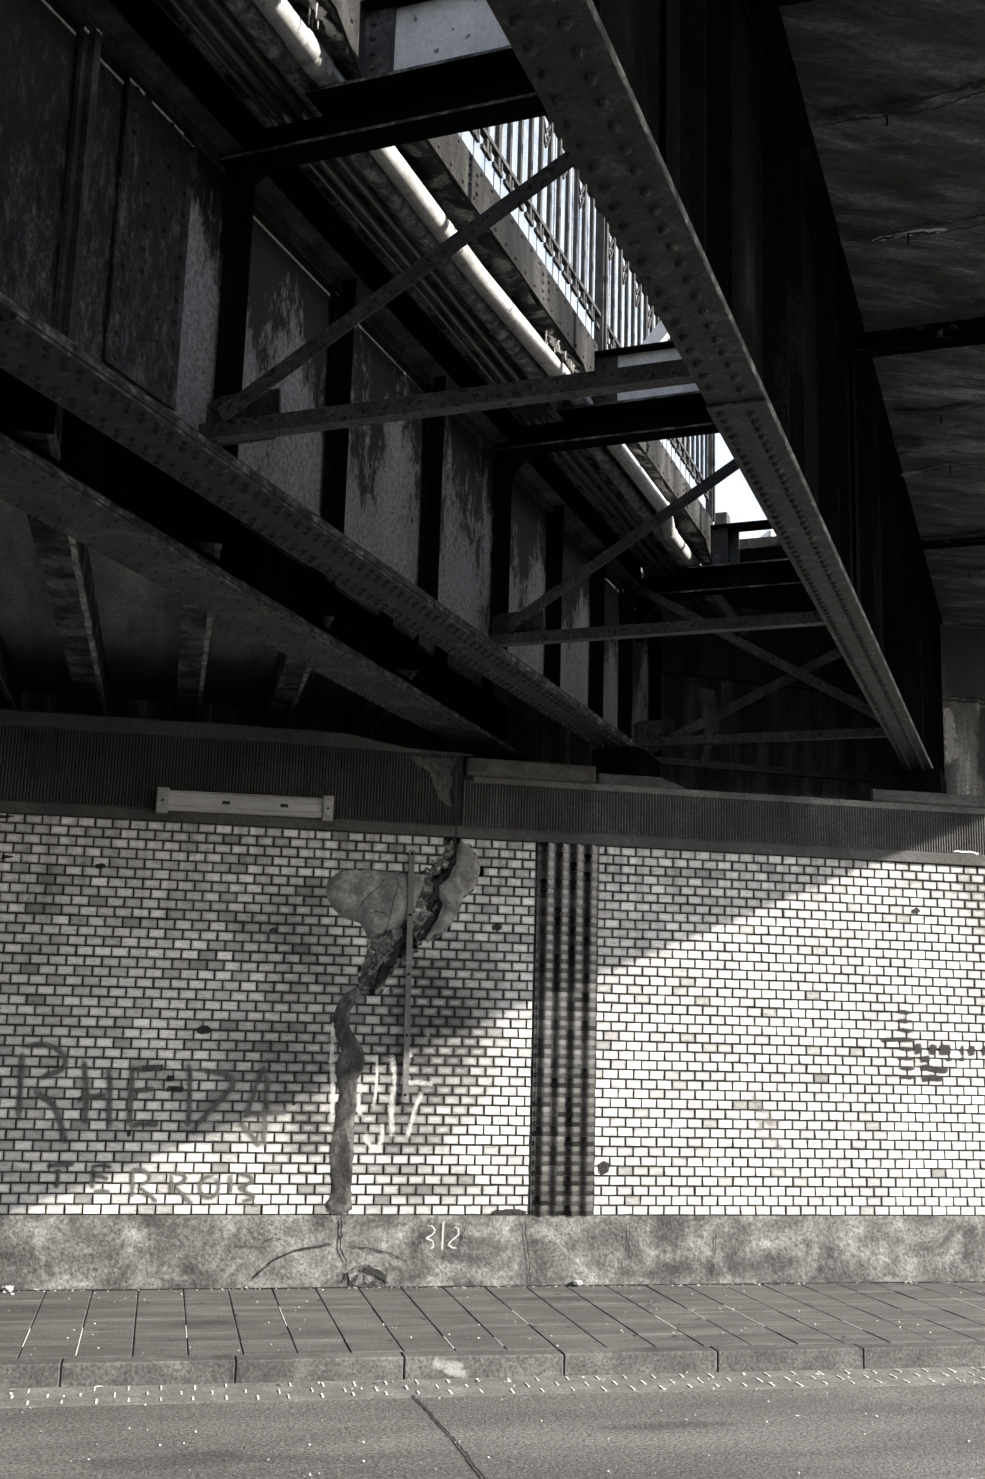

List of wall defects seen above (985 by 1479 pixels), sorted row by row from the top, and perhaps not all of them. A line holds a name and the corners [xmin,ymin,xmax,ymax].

crack [814,79,985,127]
crack [845,214,985,249]
crack [338,837,480,996]
crack [235,1218,404,1282]